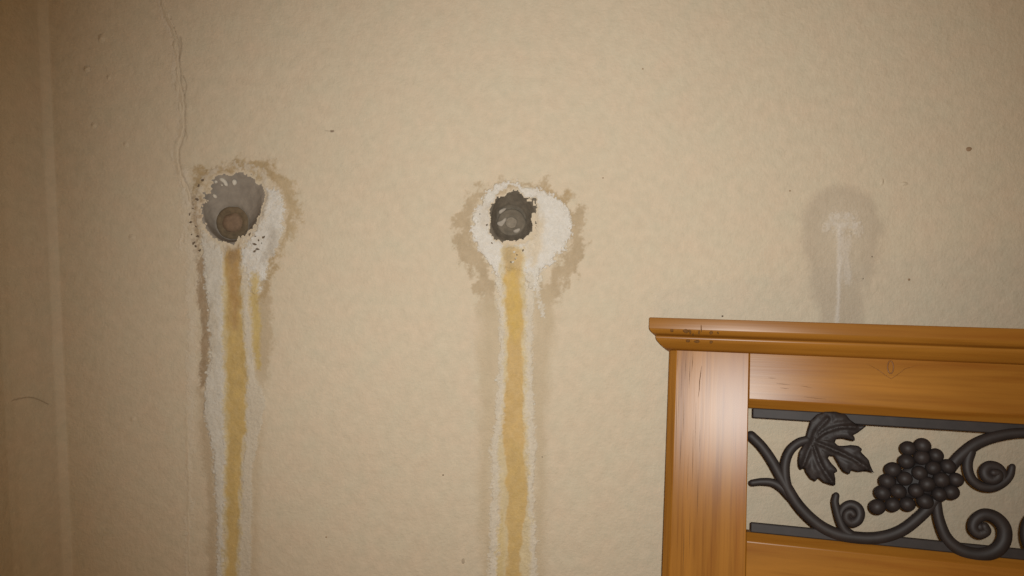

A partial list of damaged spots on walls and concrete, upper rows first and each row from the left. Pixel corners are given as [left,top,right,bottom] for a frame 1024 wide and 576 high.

spalling [200,172,265,245]
rust [217,236,265,576]
leakage [175,151,309,576]
spalling [489,189,537,243]
rust [492,199,537,576]
leakage [448,171,594,576]
leakage [791,179,894,324]